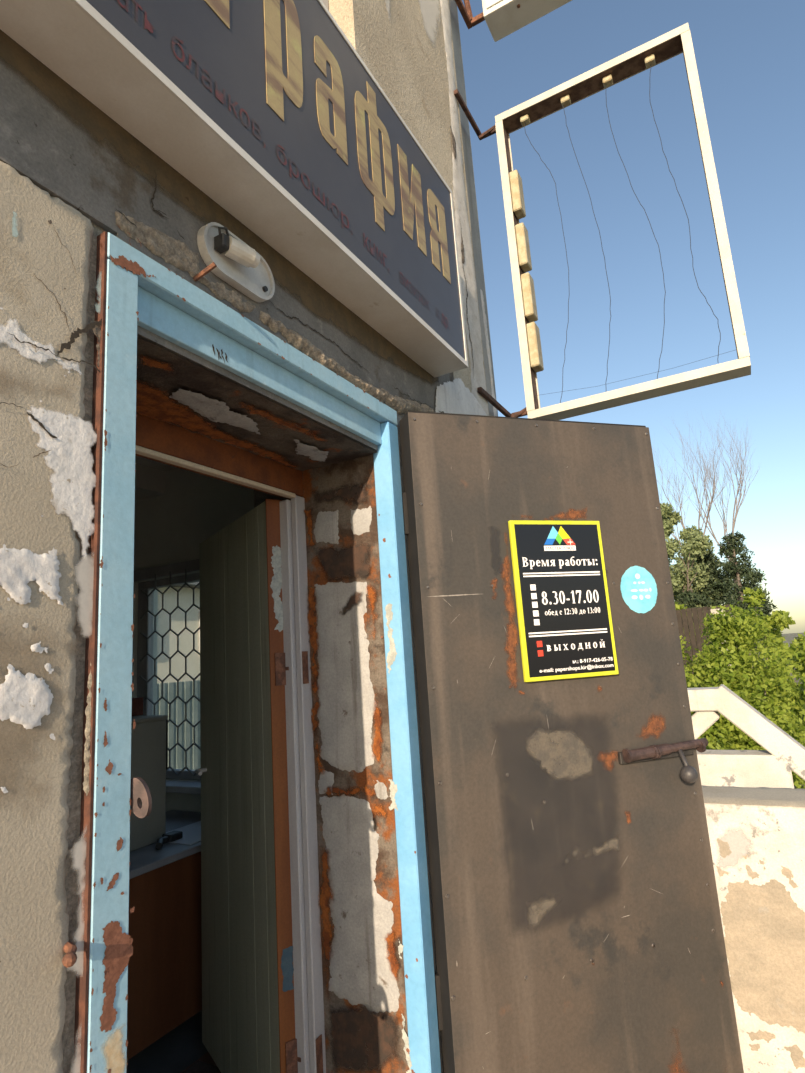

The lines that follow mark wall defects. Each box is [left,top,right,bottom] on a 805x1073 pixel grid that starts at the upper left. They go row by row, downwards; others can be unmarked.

crack [0,402,57,467]
flaking render [170,389,260,434]
flaking render [294,439,328,462]
peeling [0,544,65,606]
peeling [381,603,397,673]
rust [491,556,525,694]
peeling [0,641,54,729]
rust [641,716,664,737]
peeling [389,779,398,810]
peeling [716,838,805,1069]
rust [100,921,133,1073]
peeling [401,1014,415,1073]